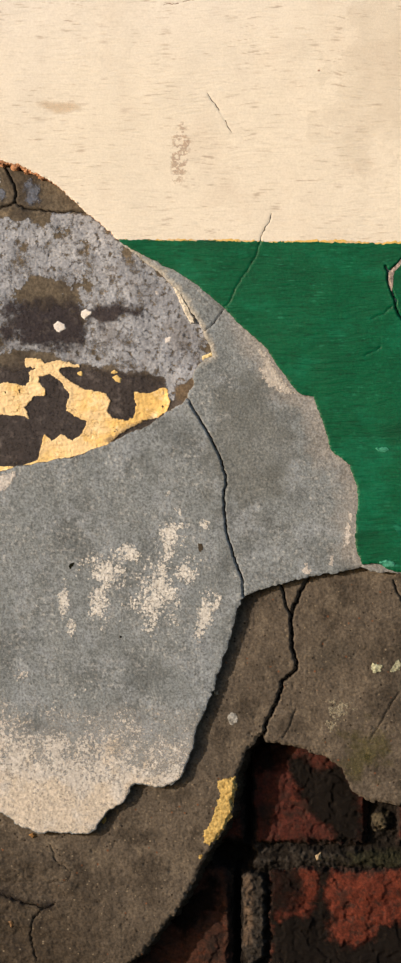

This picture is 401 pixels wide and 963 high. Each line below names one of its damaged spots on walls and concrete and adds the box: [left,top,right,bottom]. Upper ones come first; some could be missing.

crack [0,167,83,214]
flaking render [0,160,401,787]
crack [189,399,244,597]
crack [261,579,309,742]
flaking render [0,567,401,963]
crack [0,845,69,961]